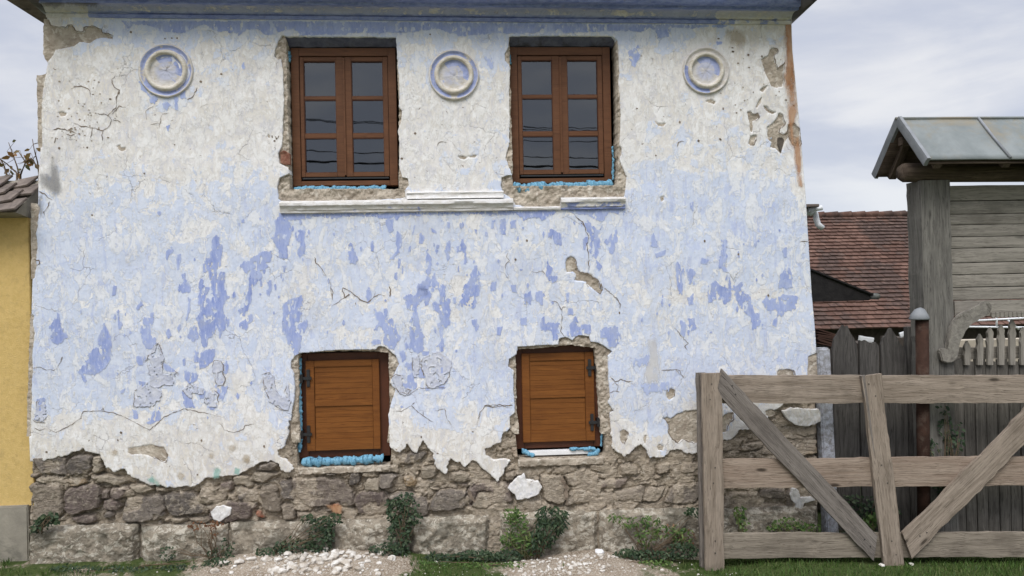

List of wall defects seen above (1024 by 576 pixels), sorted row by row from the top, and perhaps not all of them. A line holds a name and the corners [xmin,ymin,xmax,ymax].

spalling [36,19,113,148]
crack [52,76,167,148]
corrosion [785,25,802,186]
crack [314,257,391,306]
peeling [78,20,802,450]
crack [574,214,621,307]
crack [35,408,250,432]
spalling [128,445,168,463]